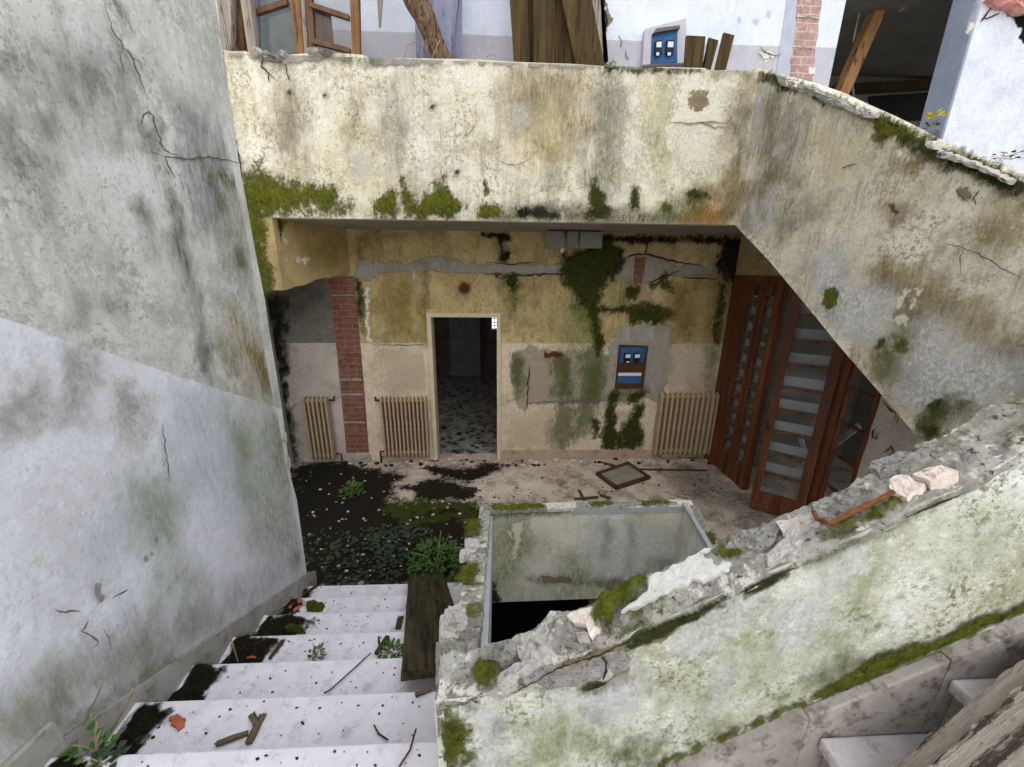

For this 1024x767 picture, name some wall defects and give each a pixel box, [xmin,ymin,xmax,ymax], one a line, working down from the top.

crack [104,3,148,100]
crack [151,138,244,178]
spalling [894,123,1024,203]
crack [944,242,1020,277]
flaking render [286,247,372,463]
flaking render [510,345,615,411]
rust [811,489,896,526]
water stain [538,571,583,593]
spalling [435,398,1024,711]
crack [56,610,111,647]
water stain [683,581,761,655]
water stain [772,597,825,656]